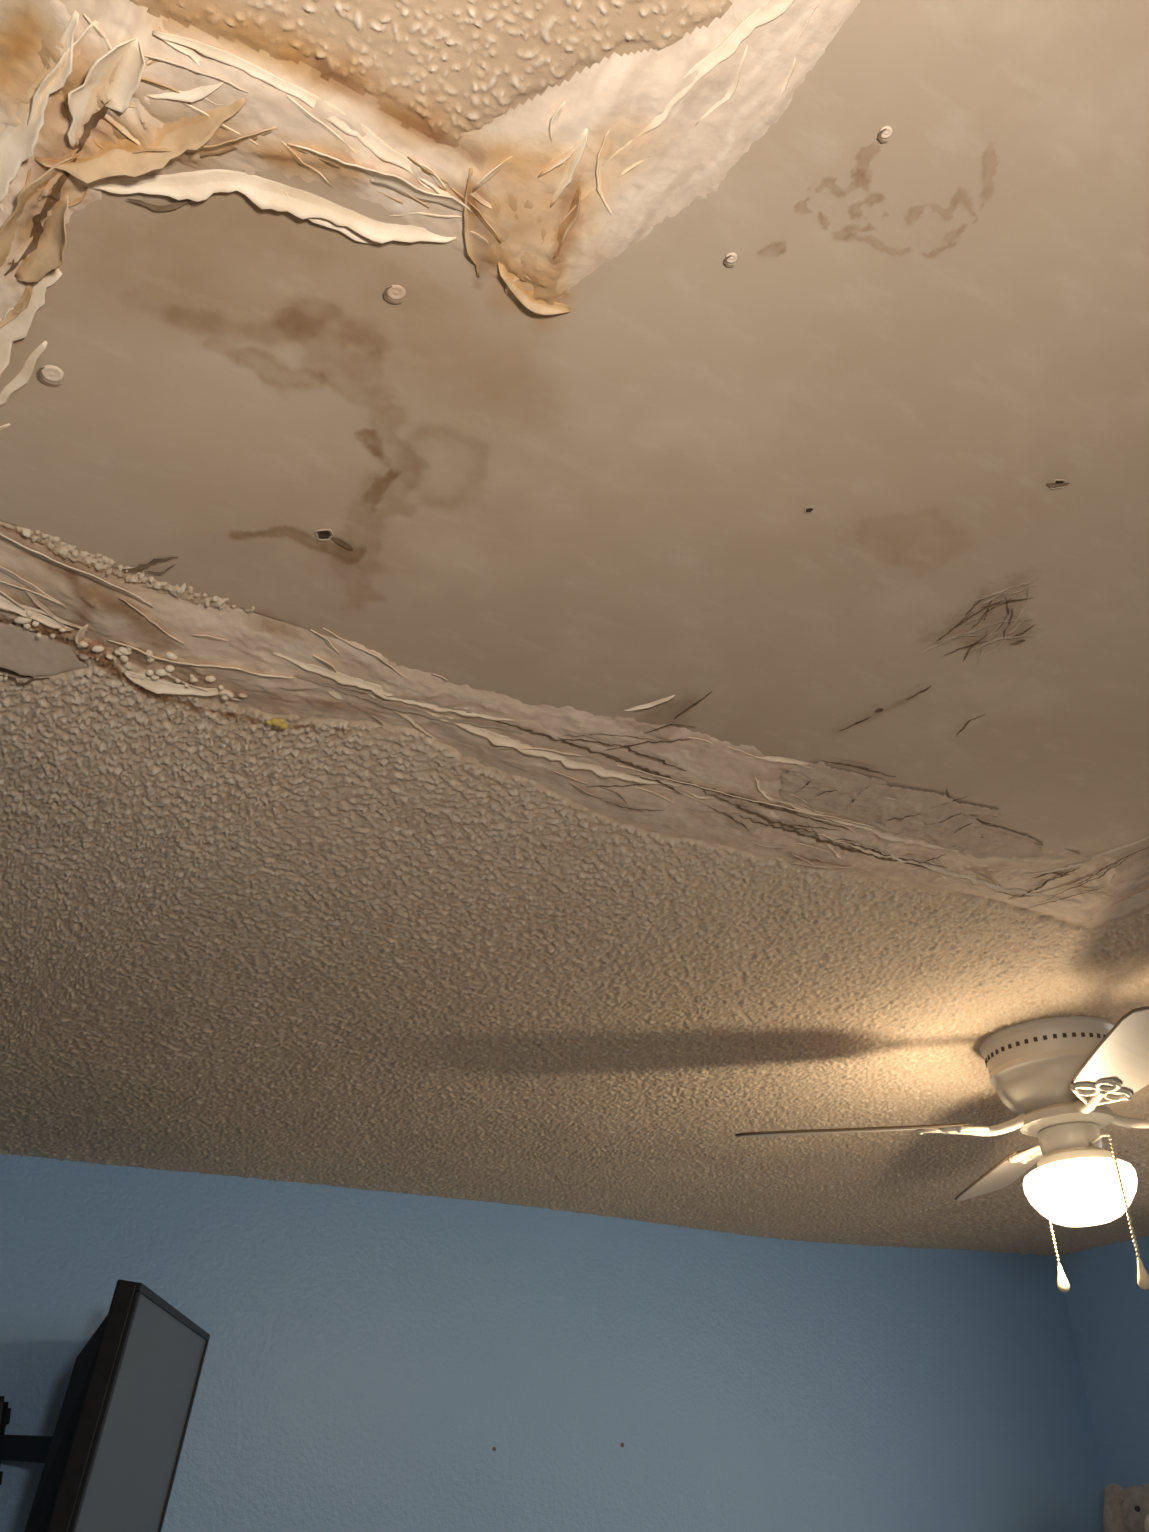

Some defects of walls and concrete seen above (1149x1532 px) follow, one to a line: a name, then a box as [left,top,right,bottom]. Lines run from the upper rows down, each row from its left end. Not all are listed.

peeling [0,10,502,406]
peeling [552,182,581,261]
peeling [498,263,572,315]
spalling [0,623,87,686]
peeling [922,578,1038,665]
peeling [635,692,711,733]
peeling [779,760,1045,859]